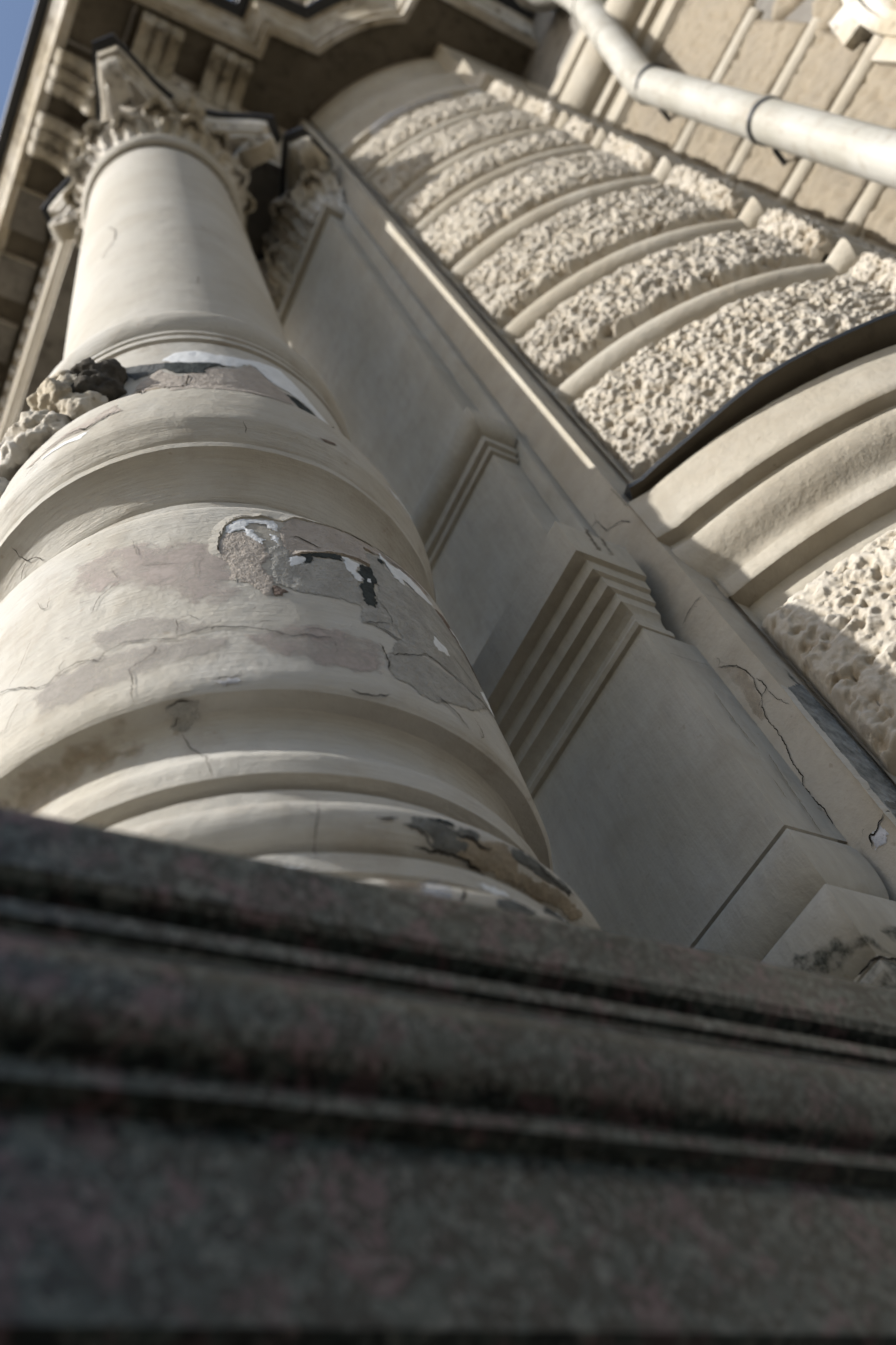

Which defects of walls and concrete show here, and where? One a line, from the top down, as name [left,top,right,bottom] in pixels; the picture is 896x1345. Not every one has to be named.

peeling [126,351,336,446]
crack [0,615,338,733]
peeling [206,513,497,737]
crack [716,657,833,824]
peeling [781,676,896,850]
spalling [378,816,583,923]
damp [795,930,896,972]